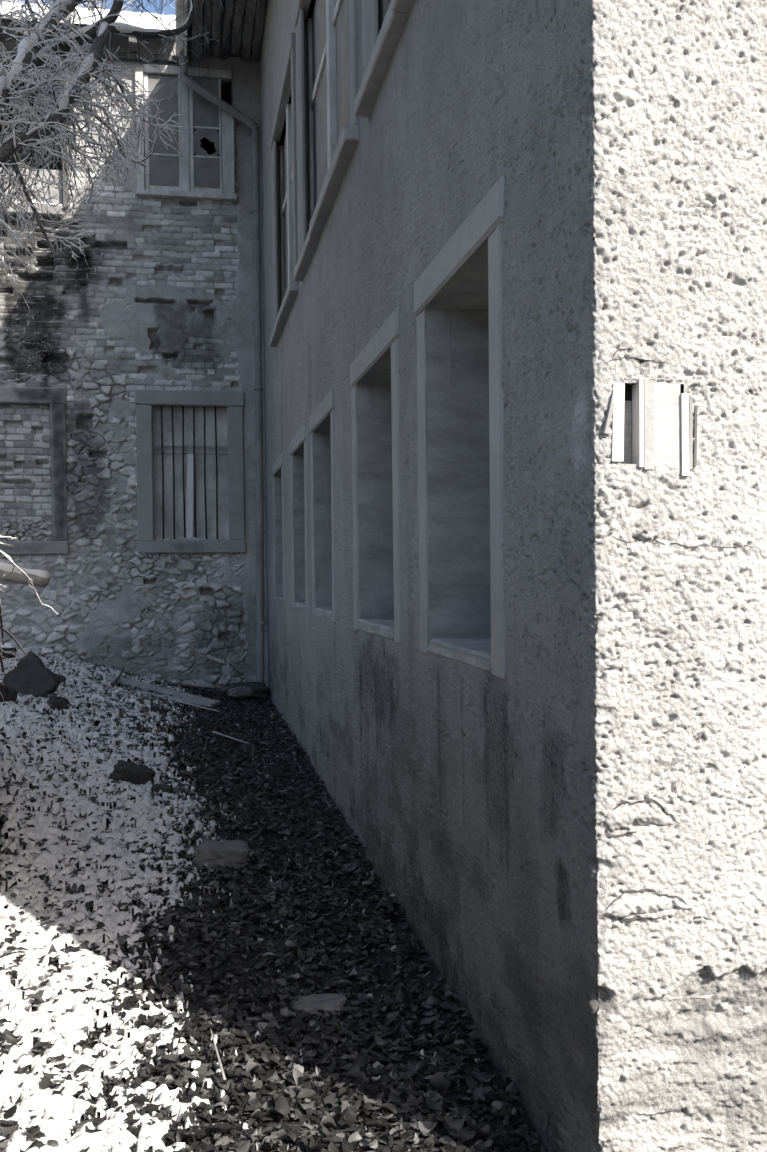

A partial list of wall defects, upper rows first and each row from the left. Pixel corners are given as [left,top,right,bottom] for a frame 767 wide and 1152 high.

leakage [0,218,102,526]
spalling [658,966,767,1037]